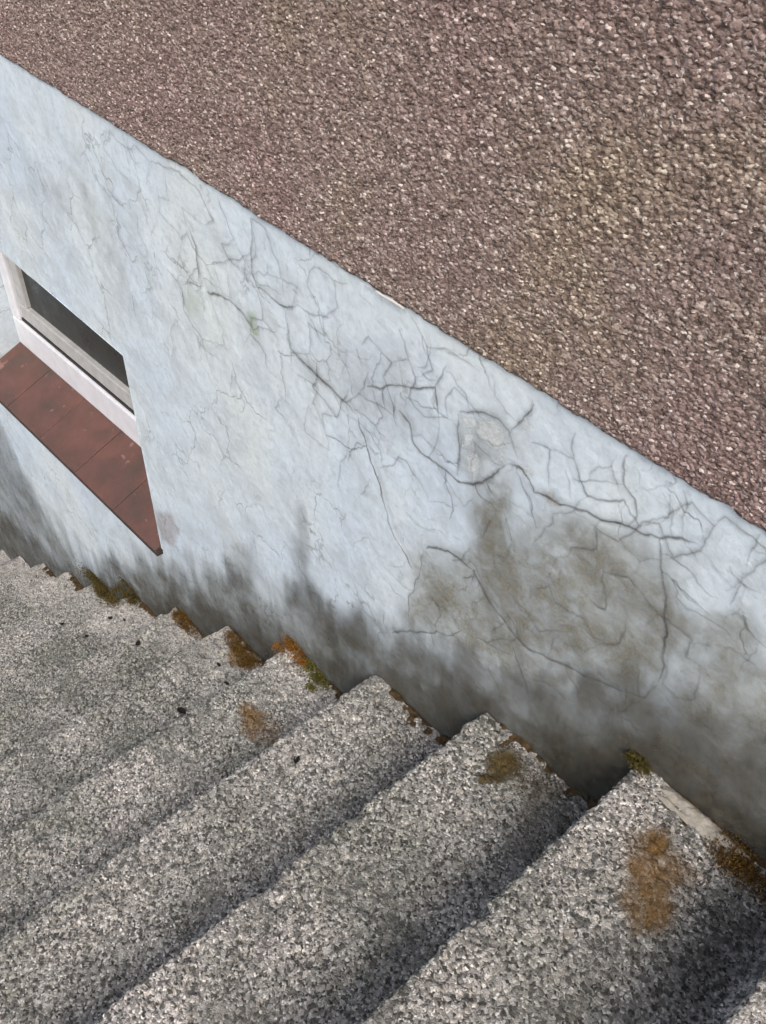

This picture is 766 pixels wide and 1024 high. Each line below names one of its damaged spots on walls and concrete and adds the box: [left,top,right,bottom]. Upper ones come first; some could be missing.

crack [190,238,250,324]
crack [298,357,348,404]
crack [349,426,384,502]
crack [371,385,687,689]
leakage [104,503,766,859]